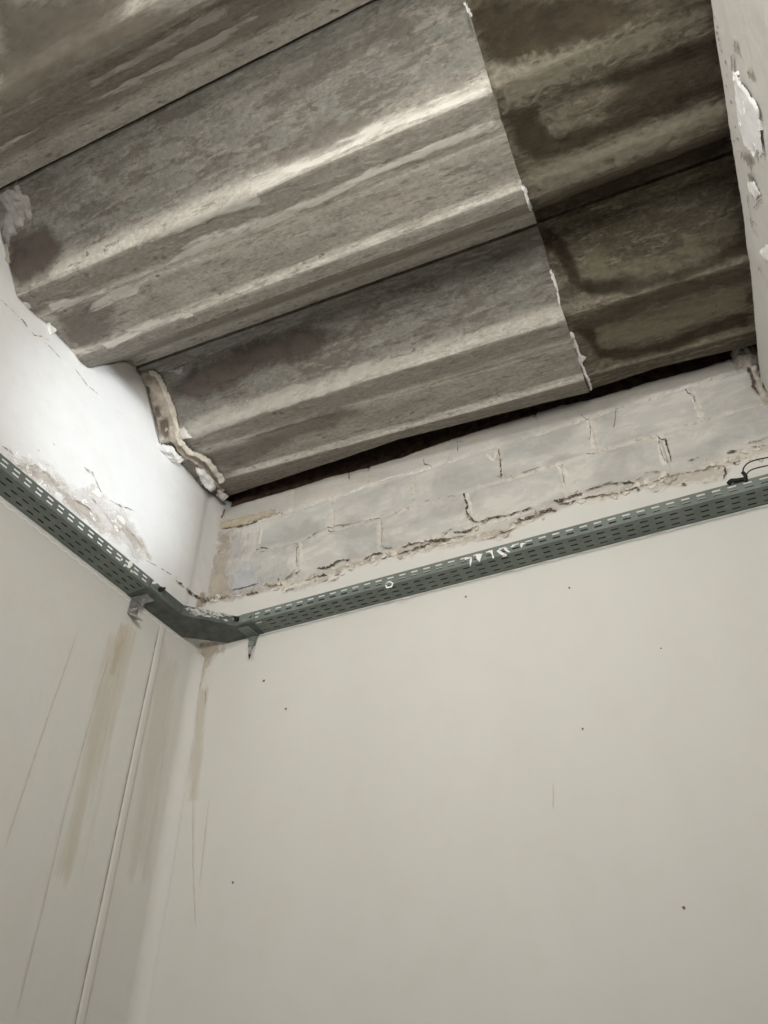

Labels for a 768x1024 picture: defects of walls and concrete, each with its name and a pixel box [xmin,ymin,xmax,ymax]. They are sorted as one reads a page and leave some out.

peeling [714,17,765,199]
damp [138,0,748,360]
damp [11,228,60,285]
peeling [758,244,768,271]
damp [49,279,148,312]
damp [187,343,449,439]
peeling [3,446,141,545]
crack [498,449,564,482]
crack [658,436,671,463]
crack [292,510,400,573]